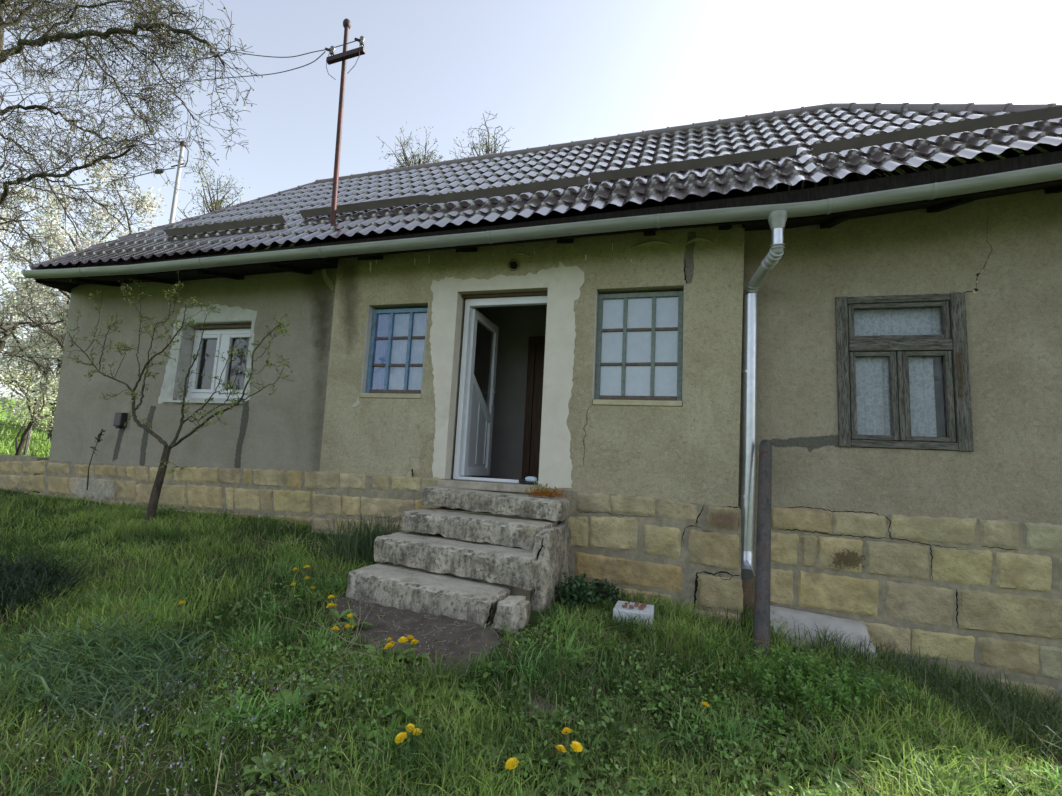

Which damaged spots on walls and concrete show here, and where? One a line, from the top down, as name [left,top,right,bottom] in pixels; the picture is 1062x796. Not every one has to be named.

crack [682,506,739,540]
crack [694,571,740,607]